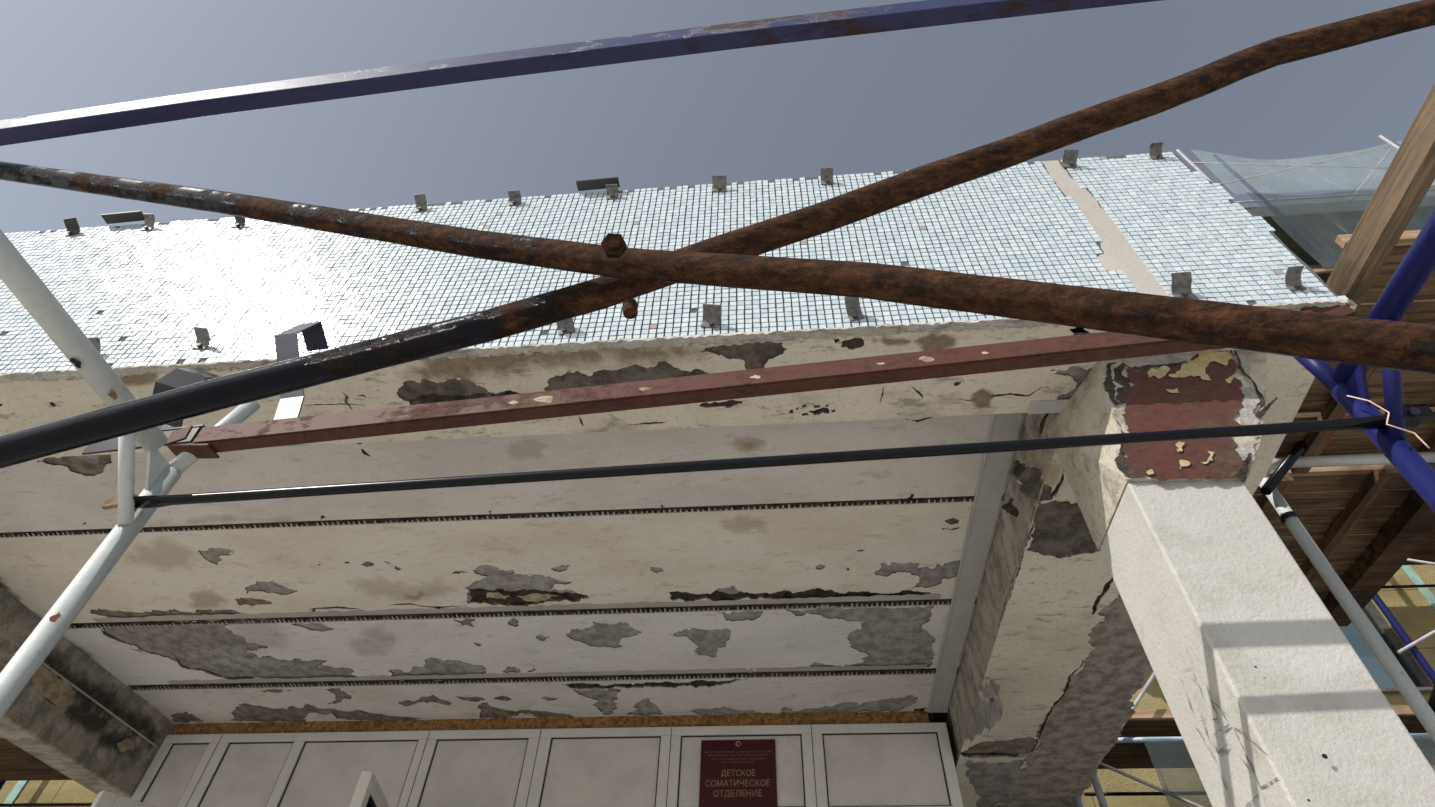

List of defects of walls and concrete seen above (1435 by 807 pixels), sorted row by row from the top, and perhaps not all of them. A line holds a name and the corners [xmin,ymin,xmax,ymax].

spalling [397,378,519,405]
spalling [545,361,710,391]
spalling [704,342,786,370]
spalling [1050,350,1278,483]
spalling [1002,460,1097,556]
peeling [199,548,234,563]
peeling [91,581,572,723]
peeling [454,565,588,625]
peeling [567,621,640,647]
peeling [670,560,960,667]
peeling [567,668,757,715]
spalling [957,577,1152,807]